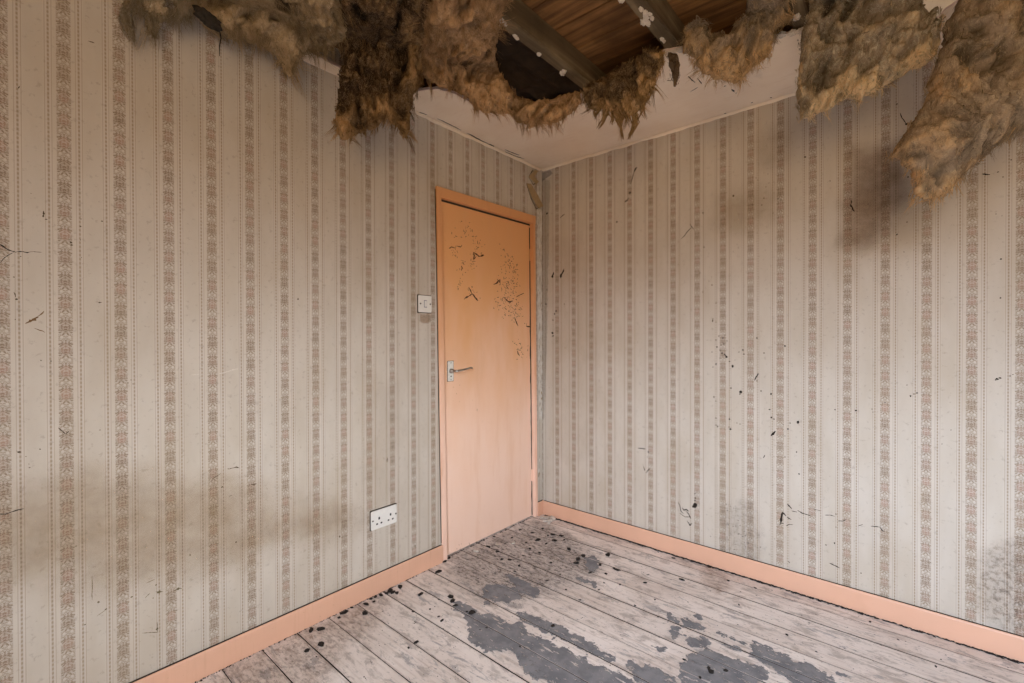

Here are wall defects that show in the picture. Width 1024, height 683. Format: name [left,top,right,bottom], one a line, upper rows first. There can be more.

peeling [576,555,600,588]
peeling [453,574,847,683]